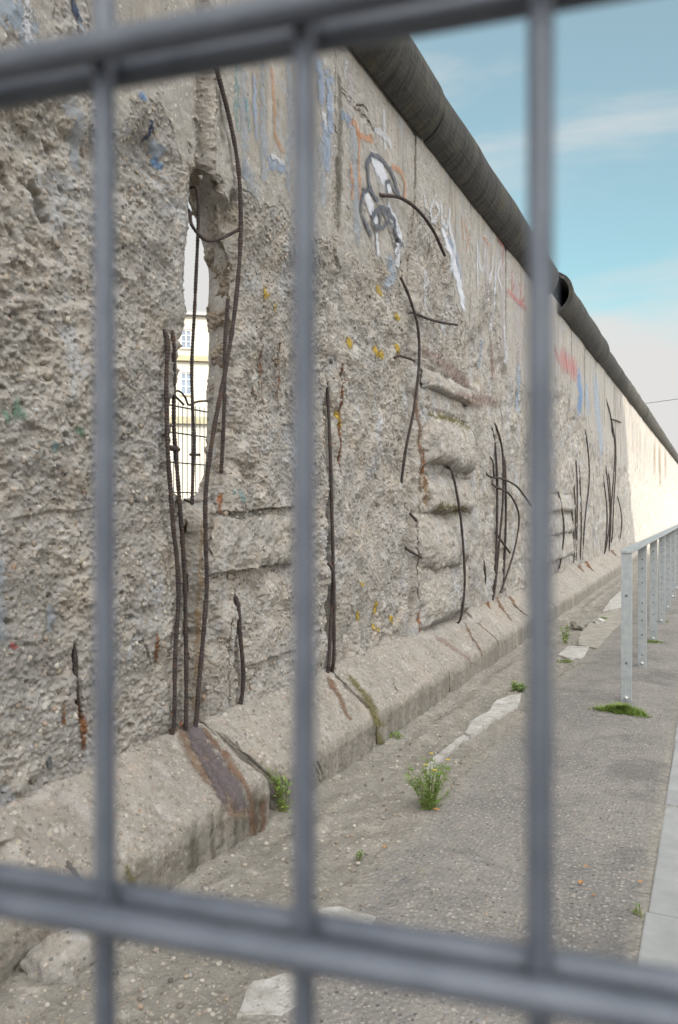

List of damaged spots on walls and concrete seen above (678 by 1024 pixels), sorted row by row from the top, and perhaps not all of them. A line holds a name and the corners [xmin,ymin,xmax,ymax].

spalling [52,0,91,36]
spalling [0,95,93,809]
spalling [116,73,292,756]
corrosion [413,389,429,506]
spalling [316,52,527,675]
spalling [554,308,626,574]
corrosion [62,691,88,751]
corrosion [171,521,267,836]